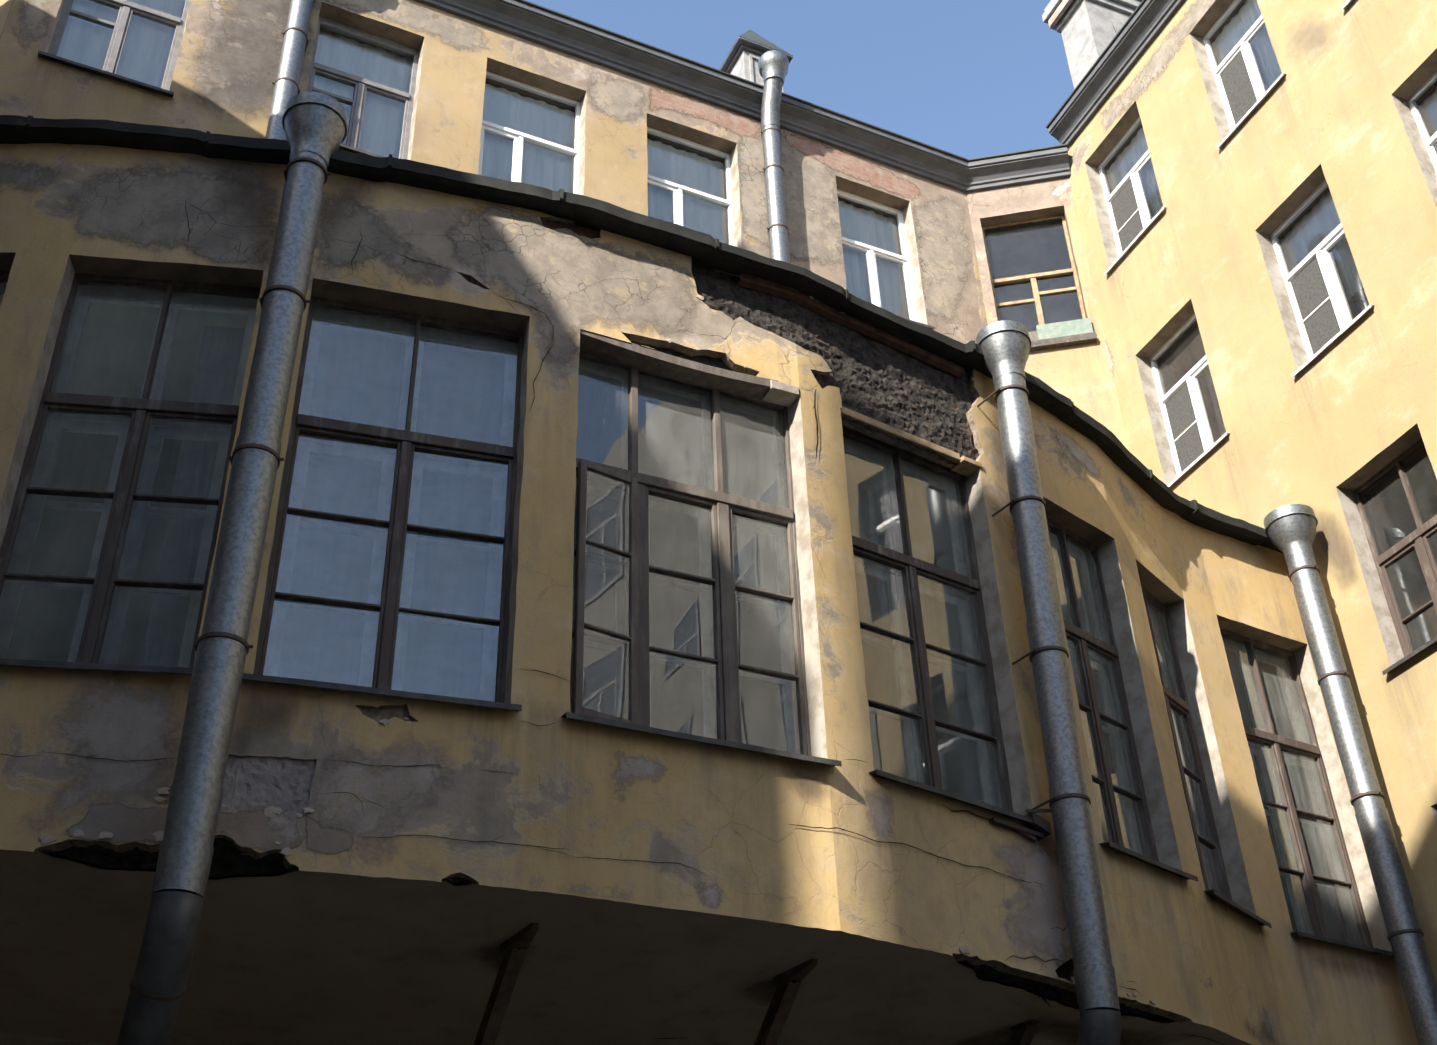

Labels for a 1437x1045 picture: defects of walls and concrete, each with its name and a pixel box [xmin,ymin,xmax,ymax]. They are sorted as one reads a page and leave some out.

water stain [194,0,291,114]
peeling [589,72,769,246]
crack [336,233,454,271]
peeling [781,131,972,319]
crack [491,289,554,409]
spalling [320,197,979,465]
crack [812,390,820,458]
crack [0,752,169,762]
peeling [39,680,178,869]
peeling [209,810,303,877]
peeling [312,743,452,853]
crack [788,824,1068,1007]